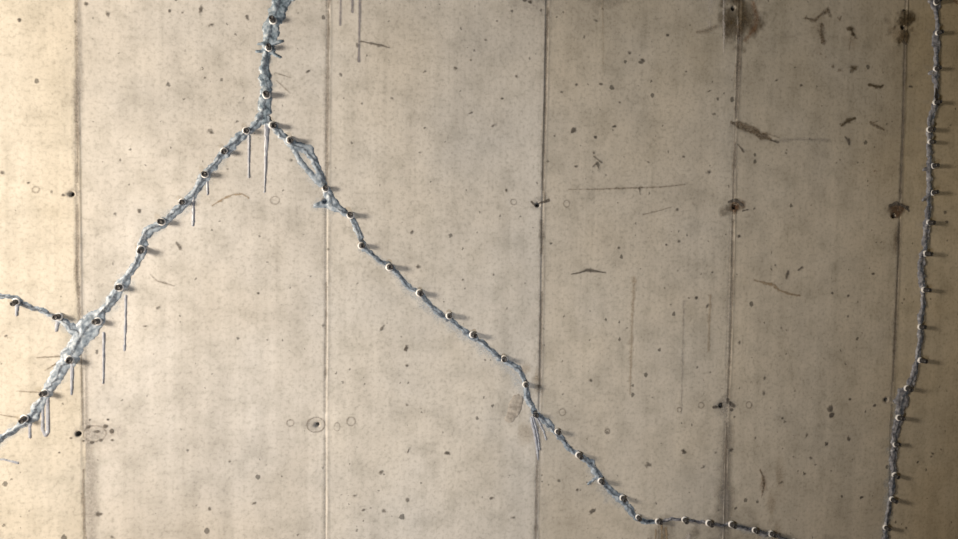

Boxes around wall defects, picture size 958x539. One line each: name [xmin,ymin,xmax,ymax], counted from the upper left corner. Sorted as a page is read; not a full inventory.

crack [0,0,728,528]
leakage [723,0,761,43]
crack [736,524,789,539]
crack [881,0,941,539]